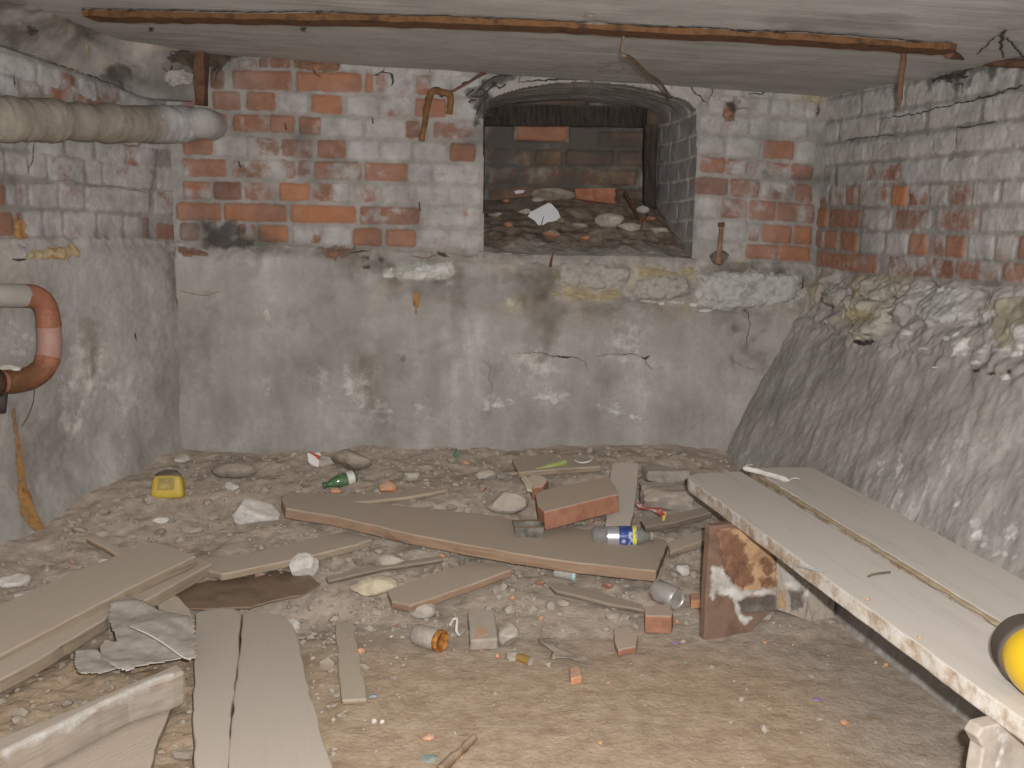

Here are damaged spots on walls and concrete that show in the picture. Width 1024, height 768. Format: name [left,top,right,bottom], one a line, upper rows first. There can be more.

crack [846,28,1024,144]
spalling [12,219,80,262]
crack [514,352,630,368]
spalling [557,261,804,312]
peeling [820,277,1024,380]
corrosion [12,411,44,532]